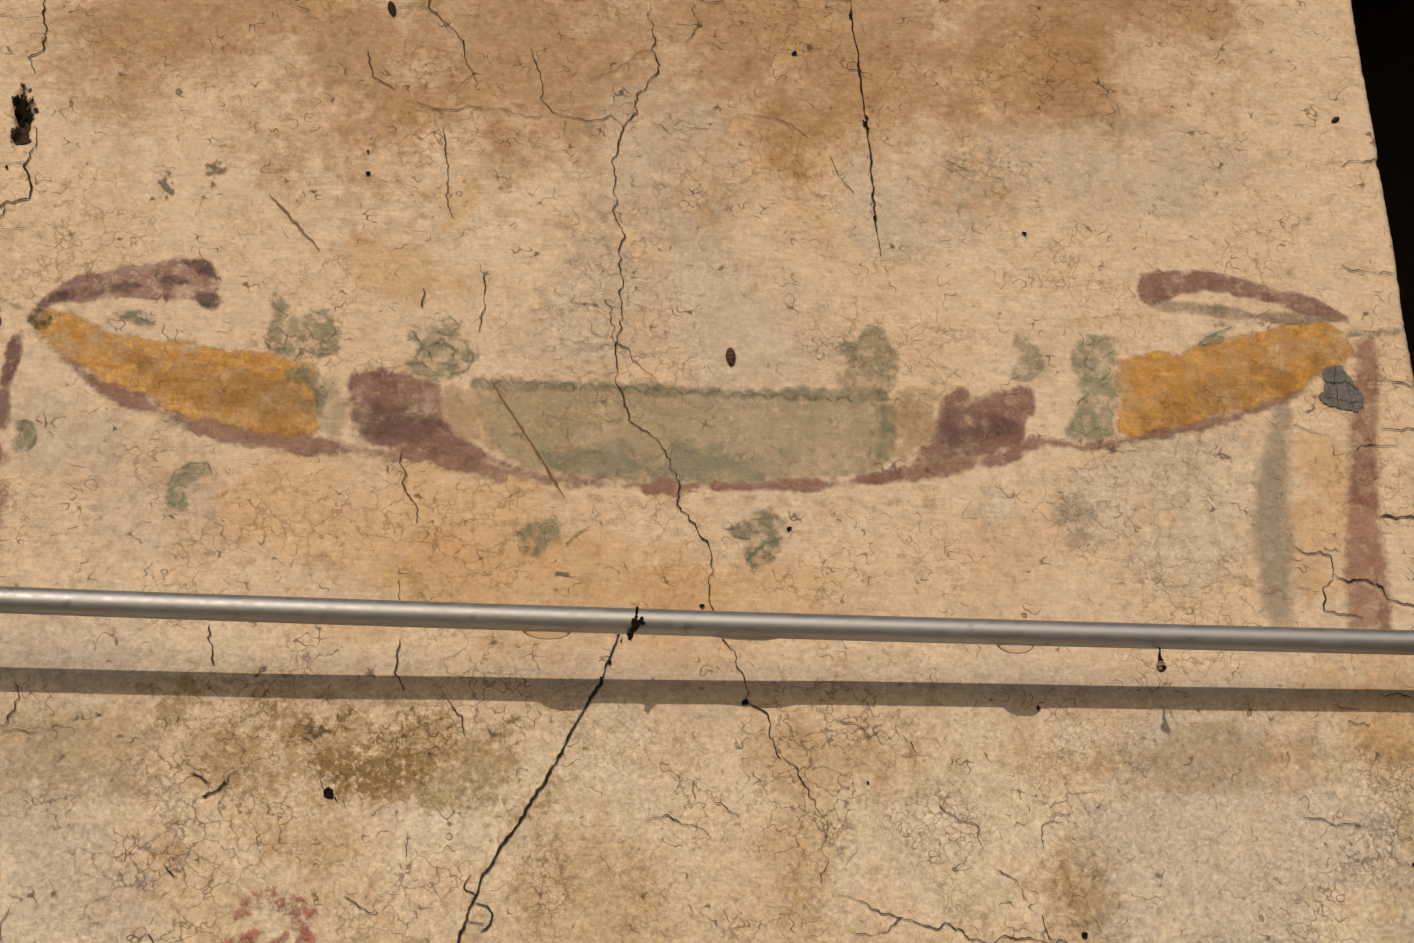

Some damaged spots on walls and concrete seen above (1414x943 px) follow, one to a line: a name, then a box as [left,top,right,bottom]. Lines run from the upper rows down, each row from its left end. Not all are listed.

crack [0,0,47,72]
crack [0,126,38,230]
crack [367,0,1067,943]